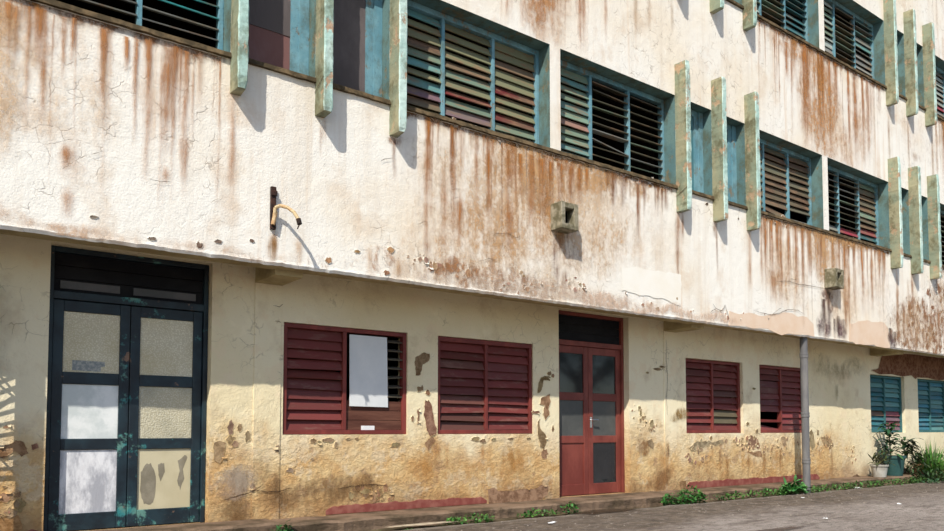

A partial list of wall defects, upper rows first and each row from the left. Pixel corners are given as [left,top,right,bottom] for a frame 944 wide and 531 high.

peeling [872,286,944,380]
rust [890,283,944,354]
peeling [0,440,39,459]
peeling [213,420,251,464]
peeling [410,352,437,451]
peeling [471,371,555,459]
peeling [685,422,834,464]
spalling [0,485,27,531]